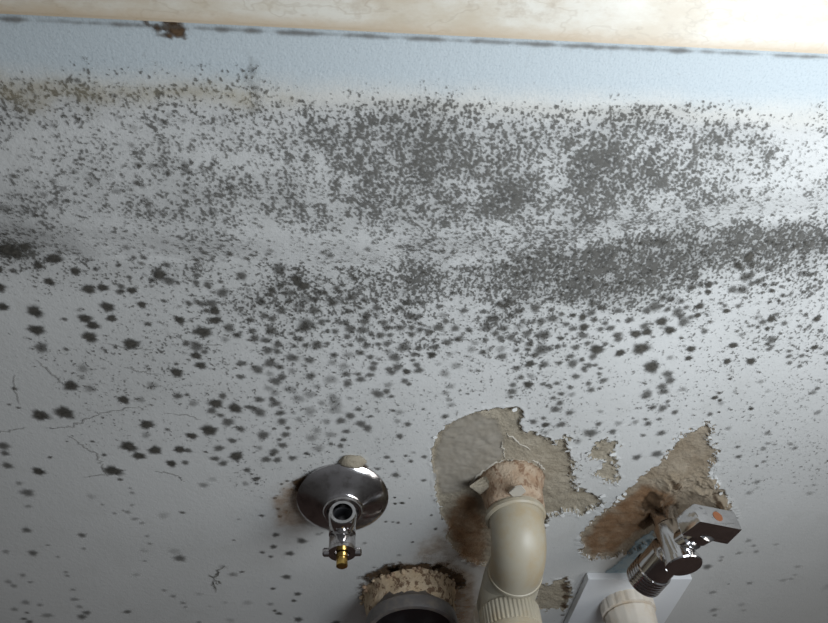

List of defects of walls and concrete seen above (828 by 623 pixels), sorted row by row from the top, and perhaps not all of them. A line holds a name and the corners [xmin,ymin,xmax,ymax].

leakage [0,59,828,486]
flaking render [431,406,738,567]